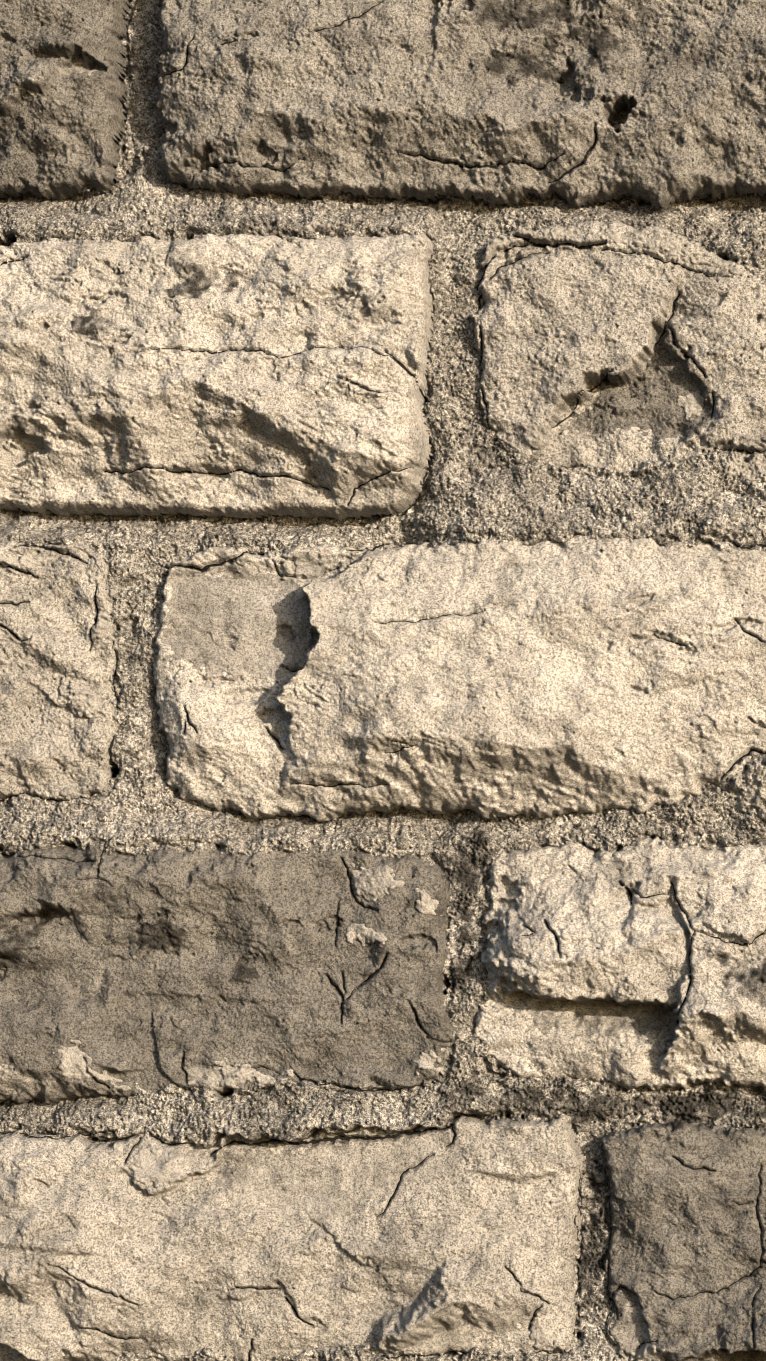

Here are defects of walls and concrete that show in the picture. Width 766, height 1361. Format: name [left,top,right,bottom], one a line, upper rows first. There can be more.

crack [477,236,766,454]
crack [327,859,388,1023]
crack [619,882,766,1052]
crack [674,1157,714,1171]
crack [506,1169,766,1354]